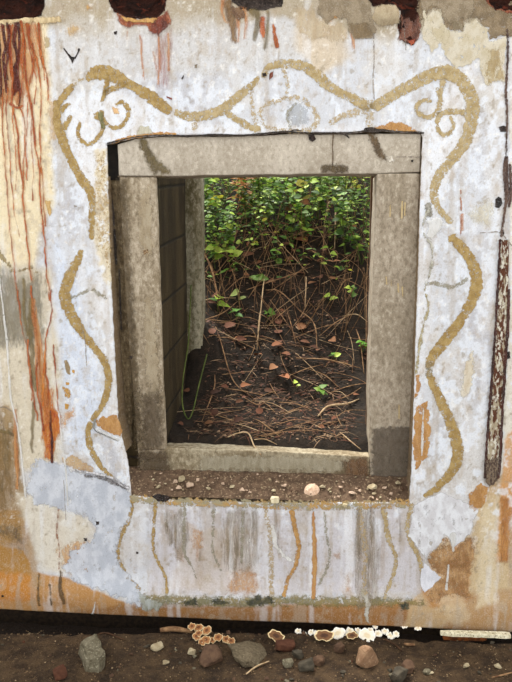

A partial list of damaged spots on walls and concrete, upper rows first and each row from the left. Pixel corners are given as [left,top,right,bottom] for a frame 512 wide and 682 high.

spalling [109,0,171,36]
rust [157,34,171,85]
rust [220,0,279,49]
flaking render [296,0,512,86]
rust [0,20,74,463]
rust [483,239,510,487]
flaking render [0,278,162,611]
flaking render [408,483,489,601]